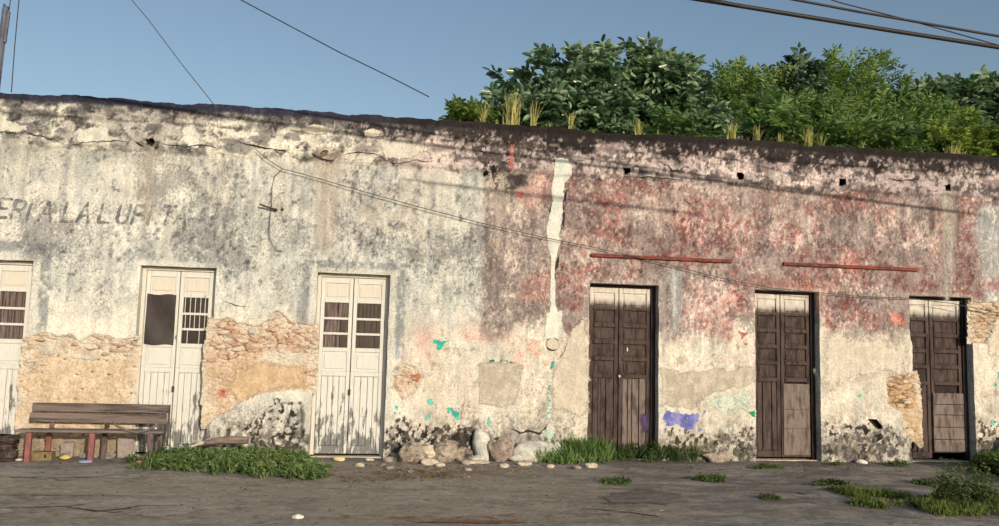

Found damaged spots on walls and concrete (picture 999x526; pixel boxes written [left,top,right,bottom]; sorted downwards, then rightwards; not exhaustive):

crack [1,131,134,145]
crack [162,140,309,154]
flaking render [966,300,999,345]
flaking render [14,333,143,457]
flaking render [200,312,320,429]
flaking render [390,337,424,414]
peeling [425,399,459,421]
flaking render [886,370,924,448]
leakage [383,416,475,453]
leakage [825,421,909,462]